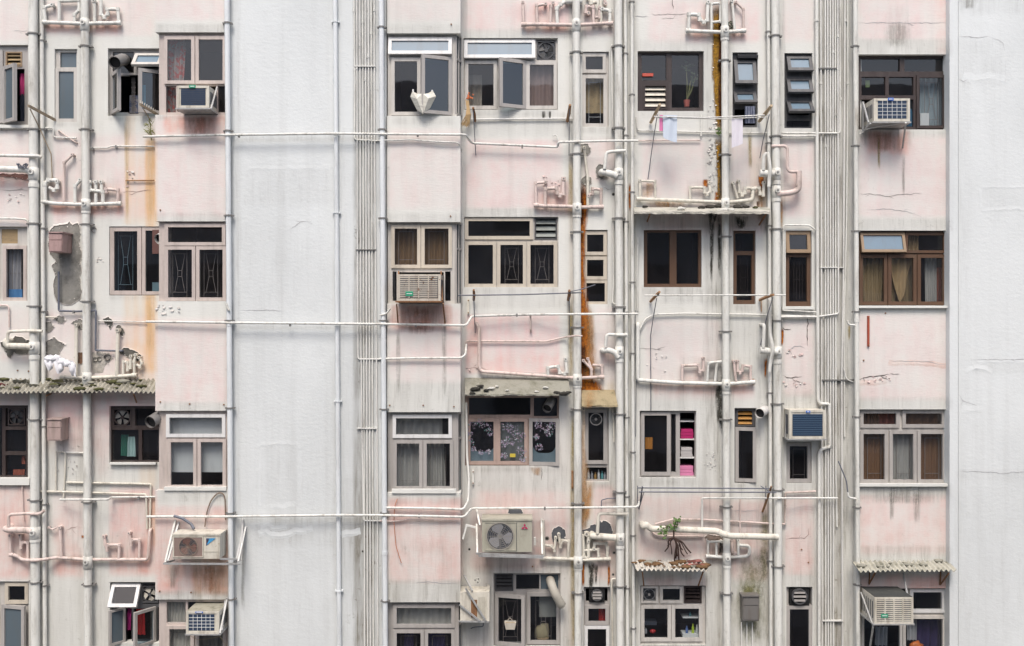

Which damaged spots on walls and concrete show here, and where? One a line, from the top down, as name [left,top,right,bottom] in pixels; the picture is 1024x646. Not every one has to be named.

rust [712,10,721,127]
rust [703,142,722,200]
spalling [46,221,82,356]
rust [581,188,601,399]
spalling [0,335,29,359]
spalling [78,316,142,374]
rust [582,469,591,526]